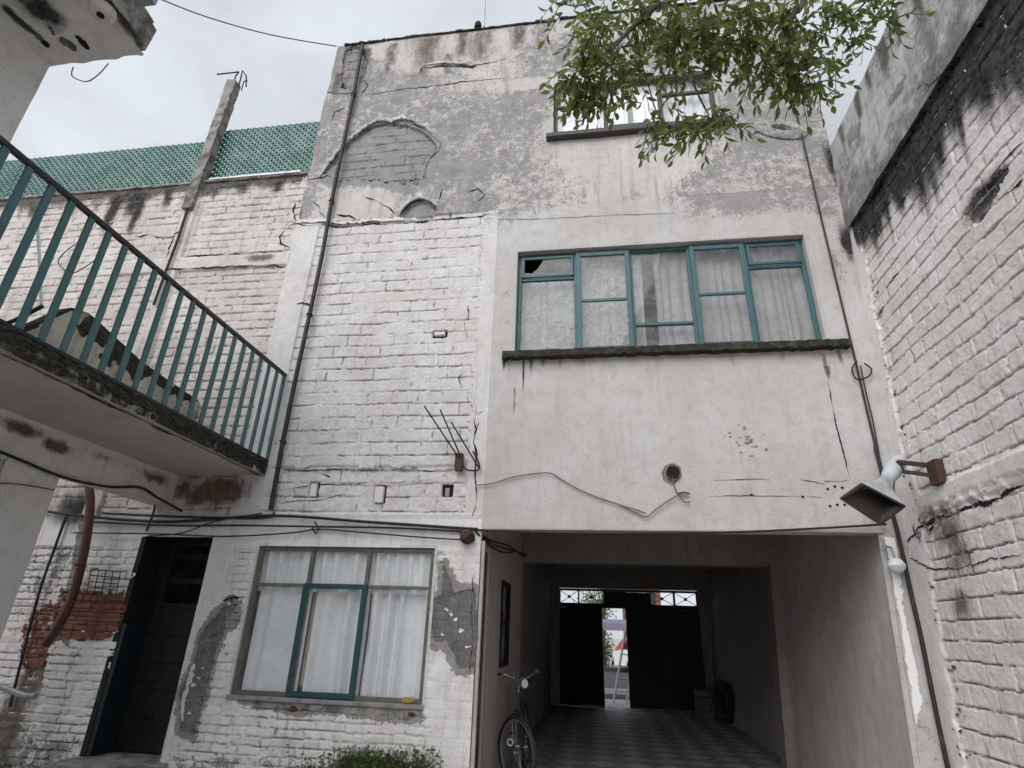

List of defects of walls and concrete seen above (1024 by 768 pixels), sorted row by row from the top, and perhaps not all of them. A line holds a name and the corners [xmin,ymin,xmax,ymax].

leakage [0,176,303,233]
spalling [314,115,443,220]
crack [332,59,502,118]
leakage [445,32,491,72]
leakage [839,0,1024,259]
mould [0,324,268,476]
crack [805,366,850,497]
crack [713,478,785,497]
crack [910,554,1021,570]
peeling [19,587,131,674]
peeling [179,596,243,735]
peeling [426,565,478,675]